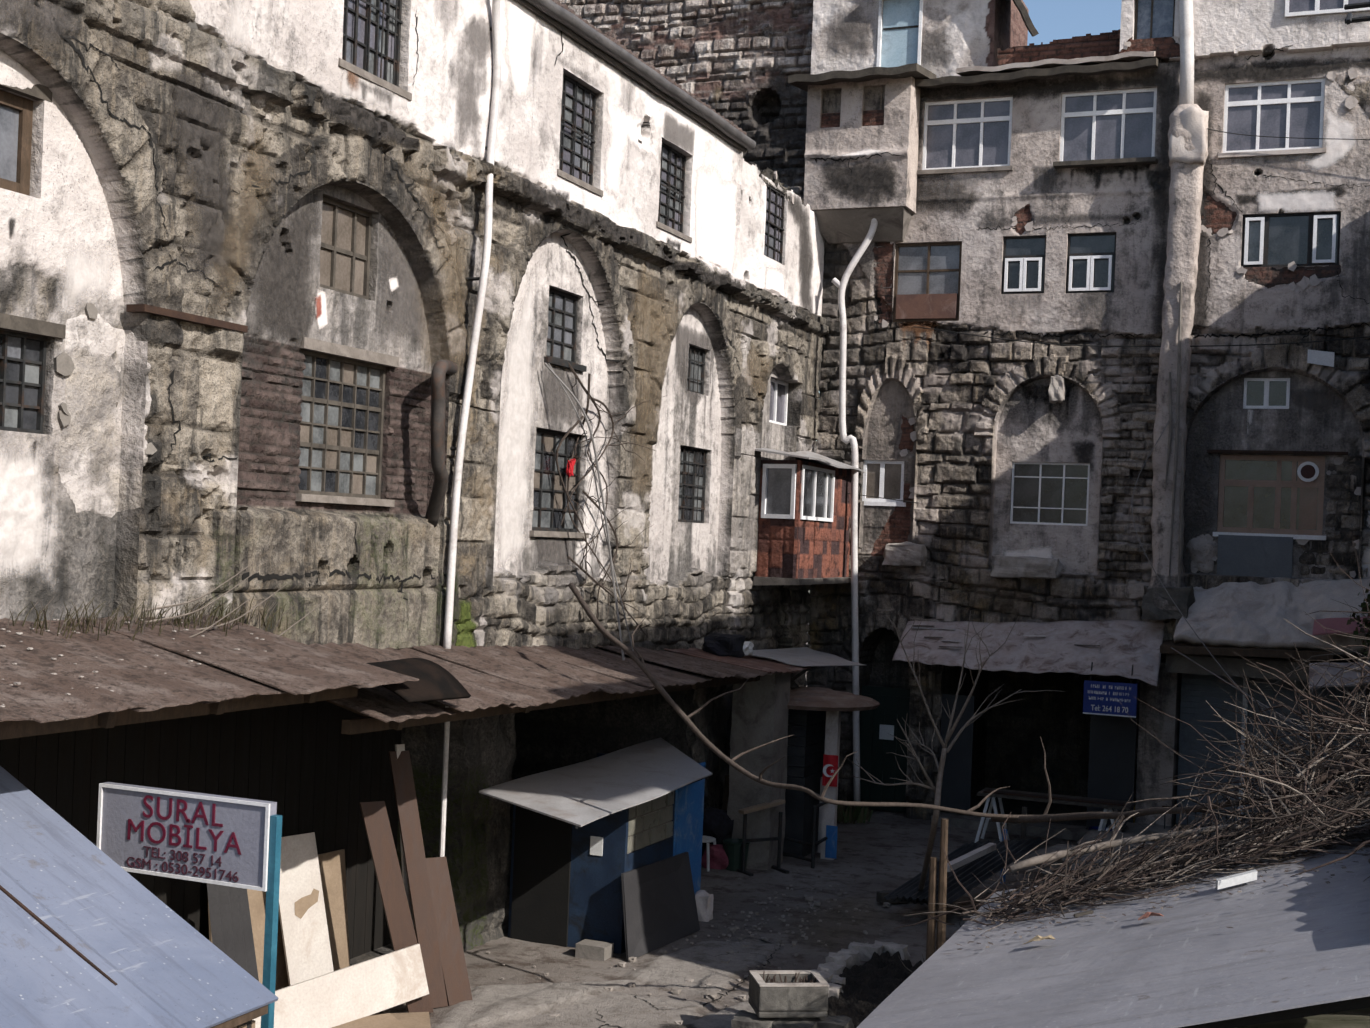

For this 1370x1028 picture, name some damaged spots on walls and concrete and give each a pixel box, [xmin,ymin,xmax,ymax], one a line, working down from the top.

spalling [1119,36,1198,63]
damp [452,18,492,143]
damp [711,71,817,318]
damp [823,161,896,202]
spalling [1010,203,1033,235]
spalling [1201,194,1237,237]
damp [62,249,111,307]
spalling [1236,261,1341,291]
peeling [54,303,157,518]